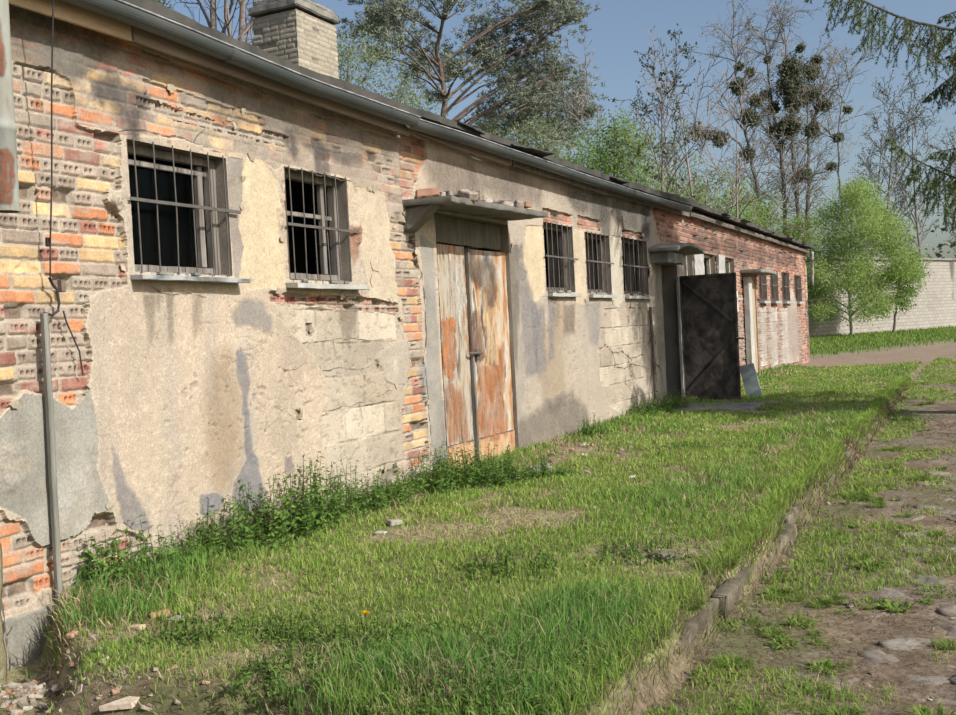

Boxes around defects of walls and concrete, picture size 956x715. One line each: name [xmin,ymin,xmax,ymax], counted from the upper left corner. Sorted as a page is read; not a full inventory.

corrosion [0,148,15,203]
flaking render [0,4,645,467]
water stain [183,350,308,550]
corrosion [441,317,468,442]
corrosion [470,282,508,438]
water stain [510,246,588,450]
flaking render [0,510,148,609]